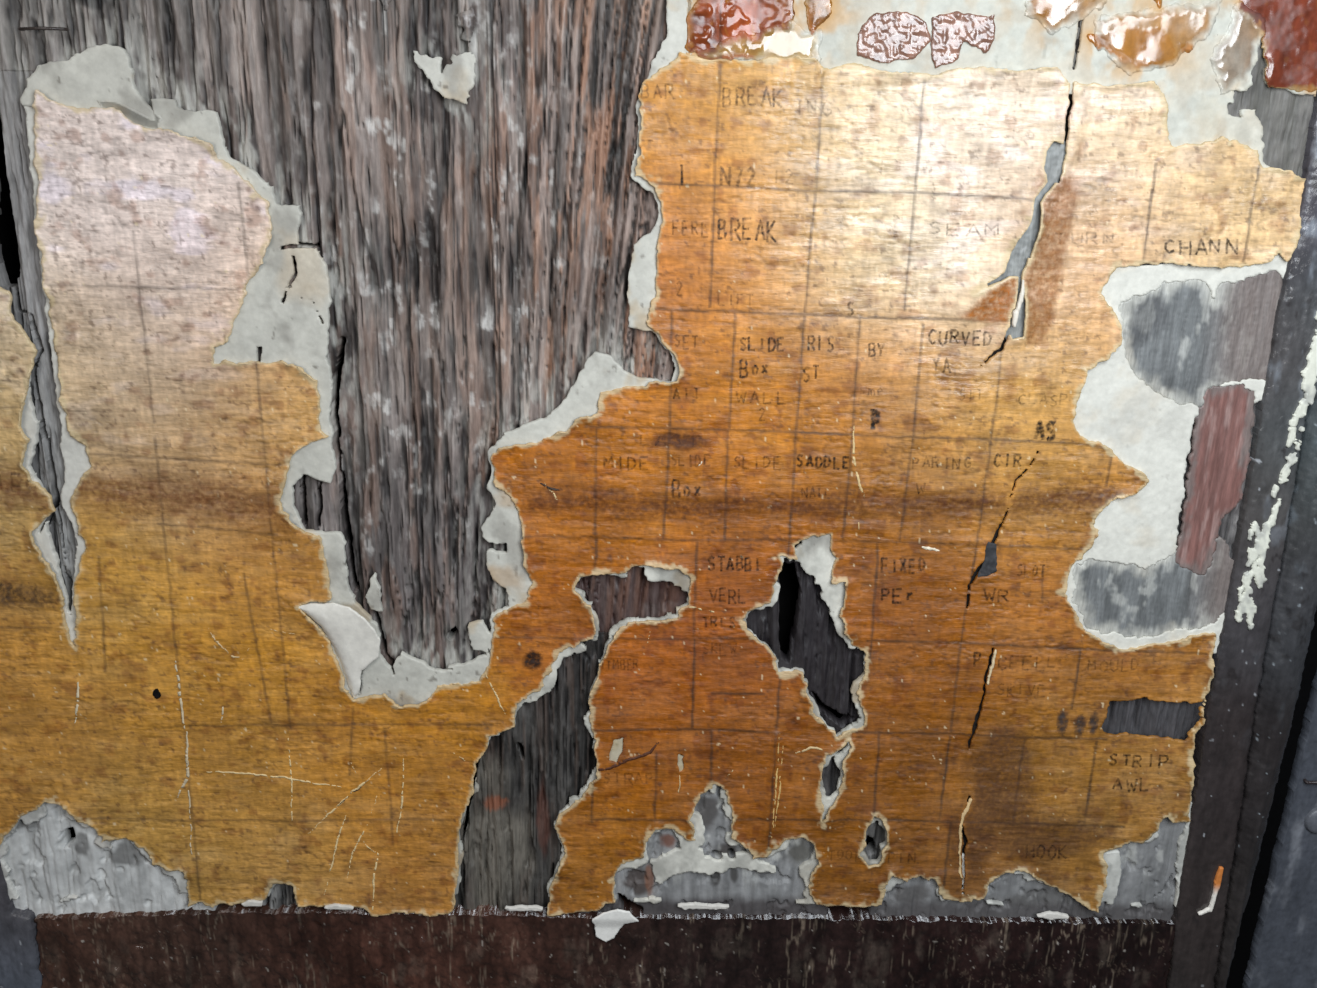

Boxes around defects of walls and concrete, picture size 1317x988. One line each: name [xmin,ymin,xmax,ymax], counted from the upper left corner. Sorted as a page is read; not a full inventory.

crack [981,20,1081,366]
peeling [0,0,1317,706]
crack [966,451,1038,608]
peeling [454,566,691,911]
peeling [743,534,866,820]
crack [968,648,997,748]
peeling [0,802,218,917]
peeling [580,784,828,915]
peeling [860,816,887,866]
crack [958,796,972,887]
peeling [868,802,1192,921]